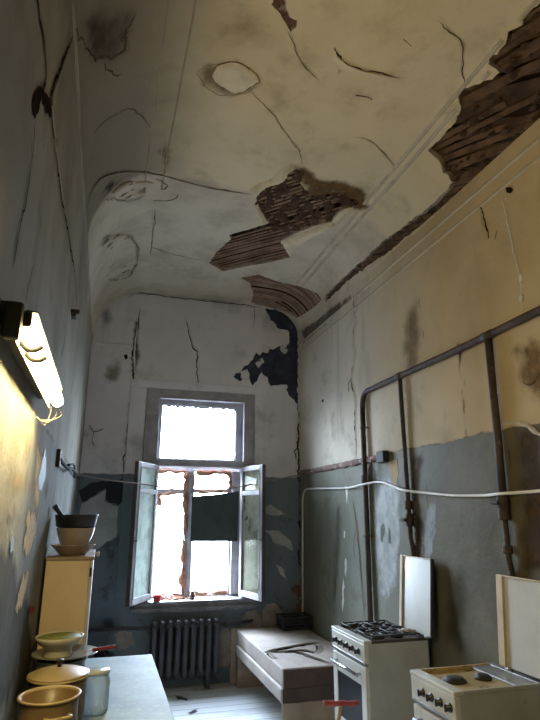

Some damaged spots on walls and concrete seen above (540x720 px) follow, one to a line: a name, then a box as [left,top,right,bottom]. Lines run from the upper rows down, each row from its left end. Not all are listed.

crack [333,47,398,79]
crack [439,21,465,83]
crack [254,95,302,159]
crack [13,0,137,355]
spalling [210,165,360,271]
spalling [234,0,540,404]
crack [129,292,256,383]
peeling [424,503,436,559]